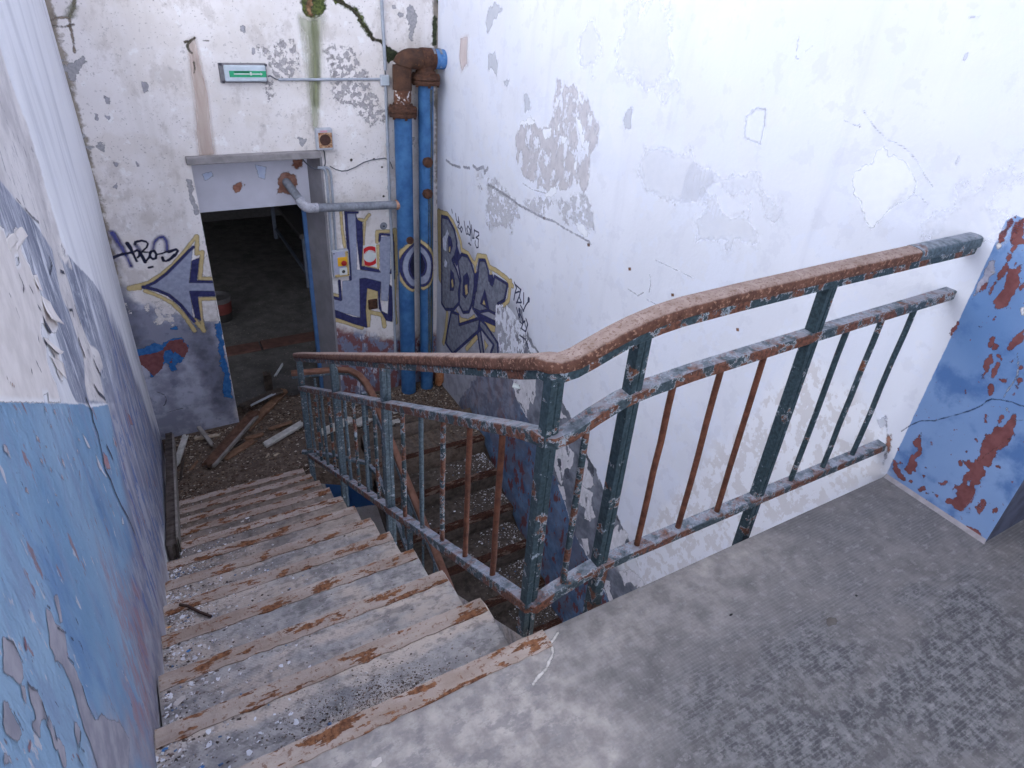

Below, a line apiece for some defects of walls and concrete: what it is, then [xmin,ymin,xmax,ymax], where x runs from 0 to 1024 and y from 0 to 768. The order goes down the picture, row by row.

corrosion [184,37,213,155]
damp [300,0,326,126]
peeling [323,46,385,126]
spalling [478,79,599,237]
peeling [925,172,1024,327]
peeling [0,226,67,427]
peeling [137,301,189,377]
peeling [195,300,233,398]
crack [878,353,1024,459]
peeling [982,329,1024,396]
peeling [554,445,595,522]
peeling [893,414,1017,517]